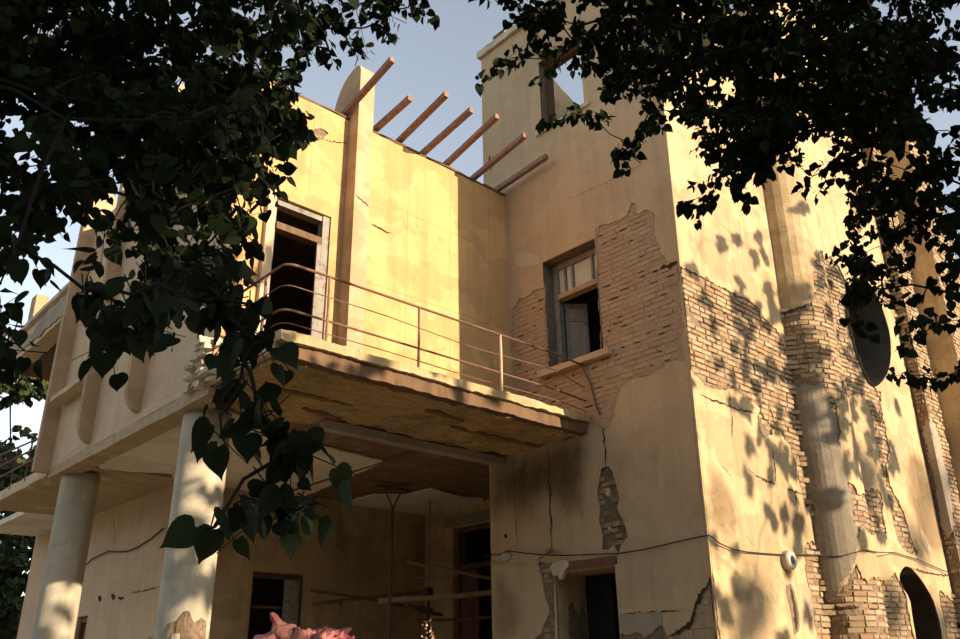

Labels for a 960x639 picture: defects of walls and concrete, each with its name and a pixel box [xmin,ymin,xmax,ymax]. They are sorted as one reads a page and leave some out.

spalling [510,203,918,555]
crack [537,484,553,561]
spalling [165,611,207,639]
spalling [534,562,587,639]
crack [625,578,711,637]
spalling [619,570,721,639]
spalling [786,583,800,635]
spalling [803,540,915,639]